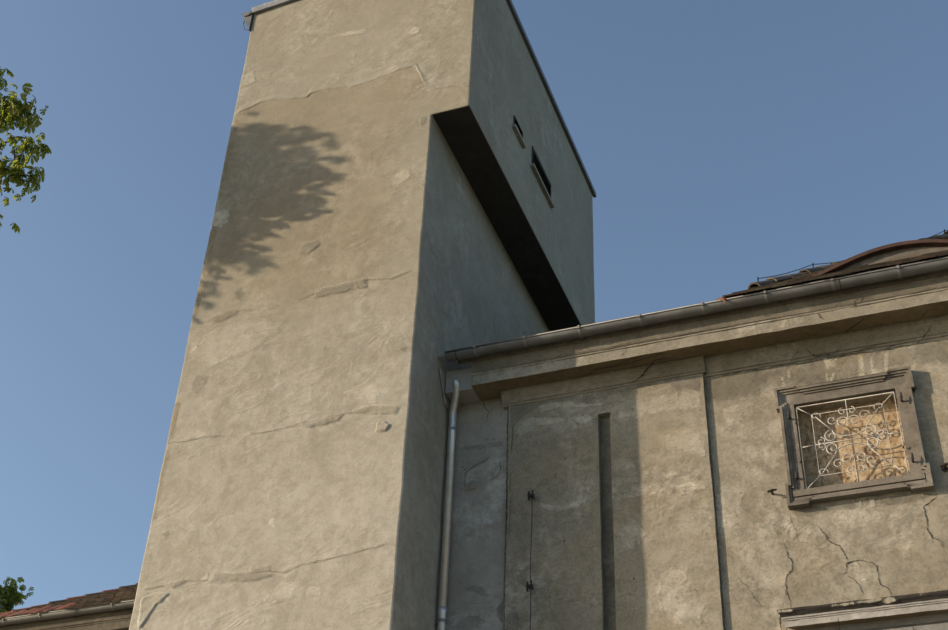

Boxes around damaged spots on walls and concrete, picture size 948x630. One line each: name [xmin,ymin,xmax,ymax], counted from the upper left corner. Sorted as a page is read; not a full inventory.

crack [537,286,948,630]